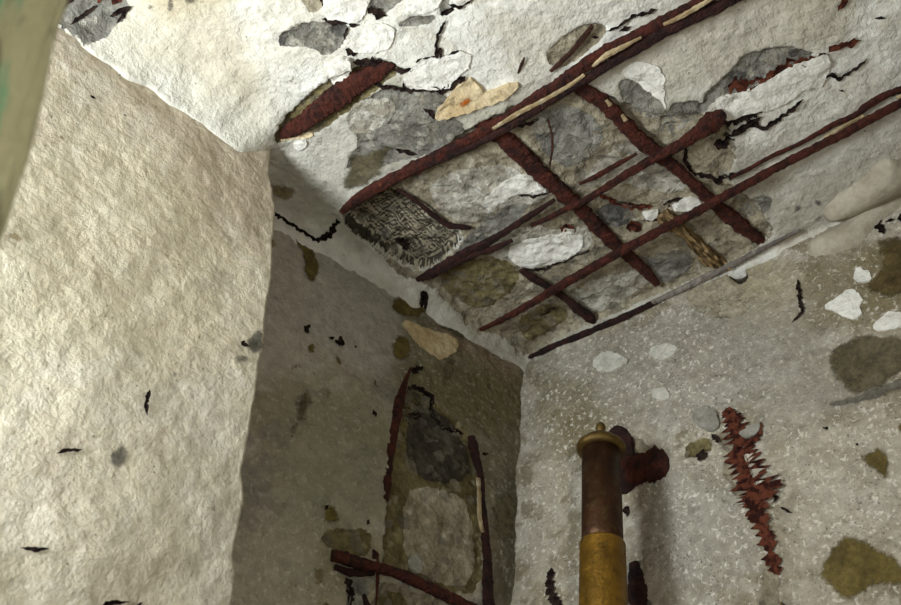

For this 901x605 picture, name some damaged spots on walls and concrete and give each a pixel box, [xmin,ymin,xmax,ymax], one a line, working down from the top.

crack [592,8,656,39]
crack [320,0,472,120]
spalling [274,0,831,361]
corrosion [339,0,901,359]
crack [275,212,341,243]
peeling [593,351,629,373]
damp [829,335,901,406]
corrosion [330,435,495,605]
spalling [383,386,483,594]
corrosion [609,425,670,494]
corrosion [627,561,648,605]
damp [821,536,901,599]